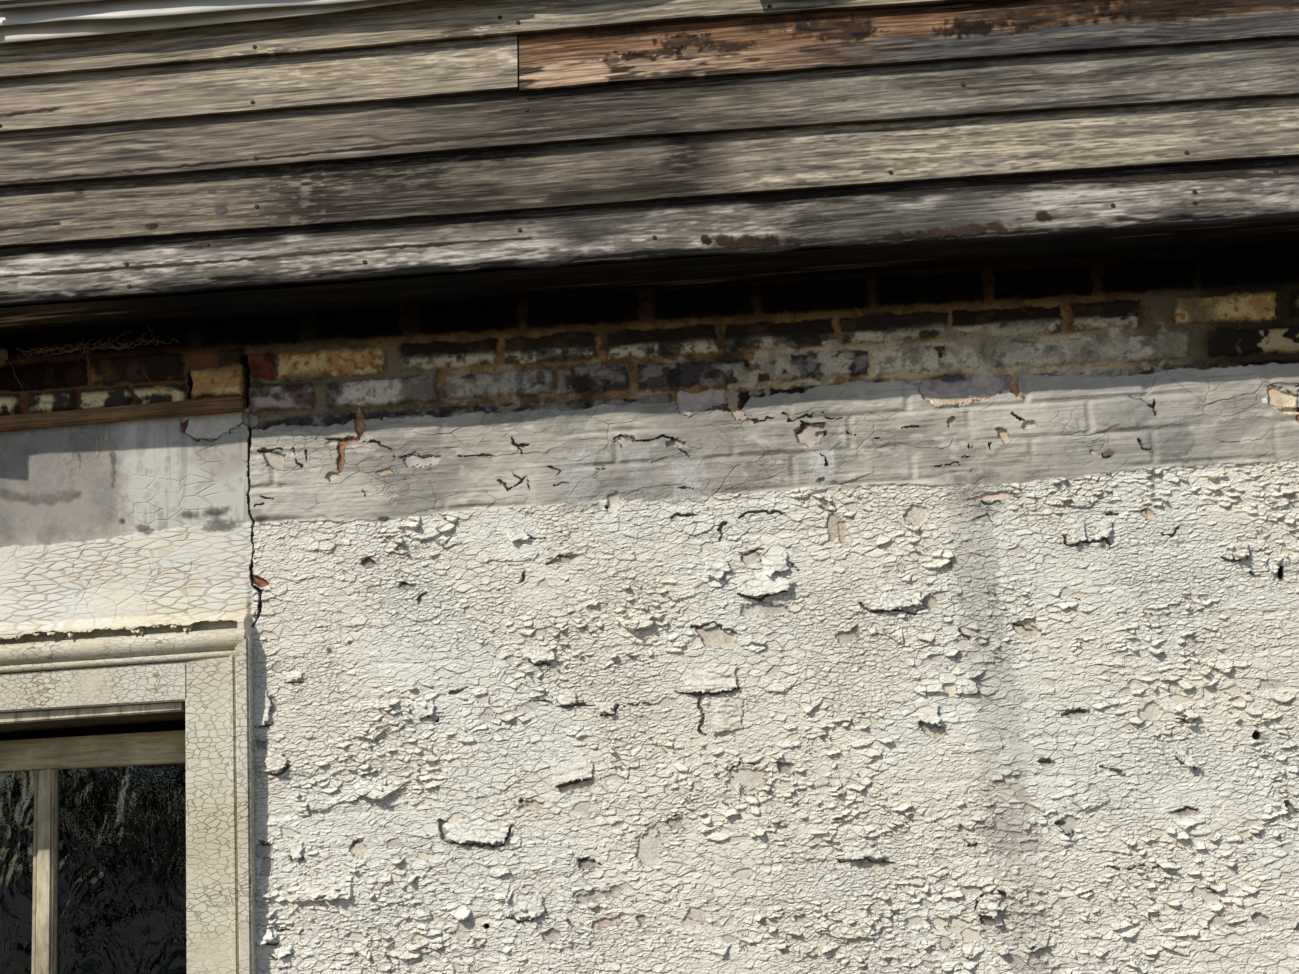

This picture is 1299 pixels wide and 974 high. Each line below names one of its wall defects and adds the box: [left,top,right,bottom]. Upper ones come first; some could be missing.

flaking render [0,242,1299,439]
crack [242,412,269,627]
peeling [702,523,793,617]
peeling [862,589,937,615]
peeling [522,645,556,666]
peeling [545,689,617,716]
peeling [682,665,744,735]
peeling [253,686,289,775]
peeling [548,760,595,793]
peeling [439,800,544,847]
peeling [841,843,897,872]
peeling [255,924,293,974]